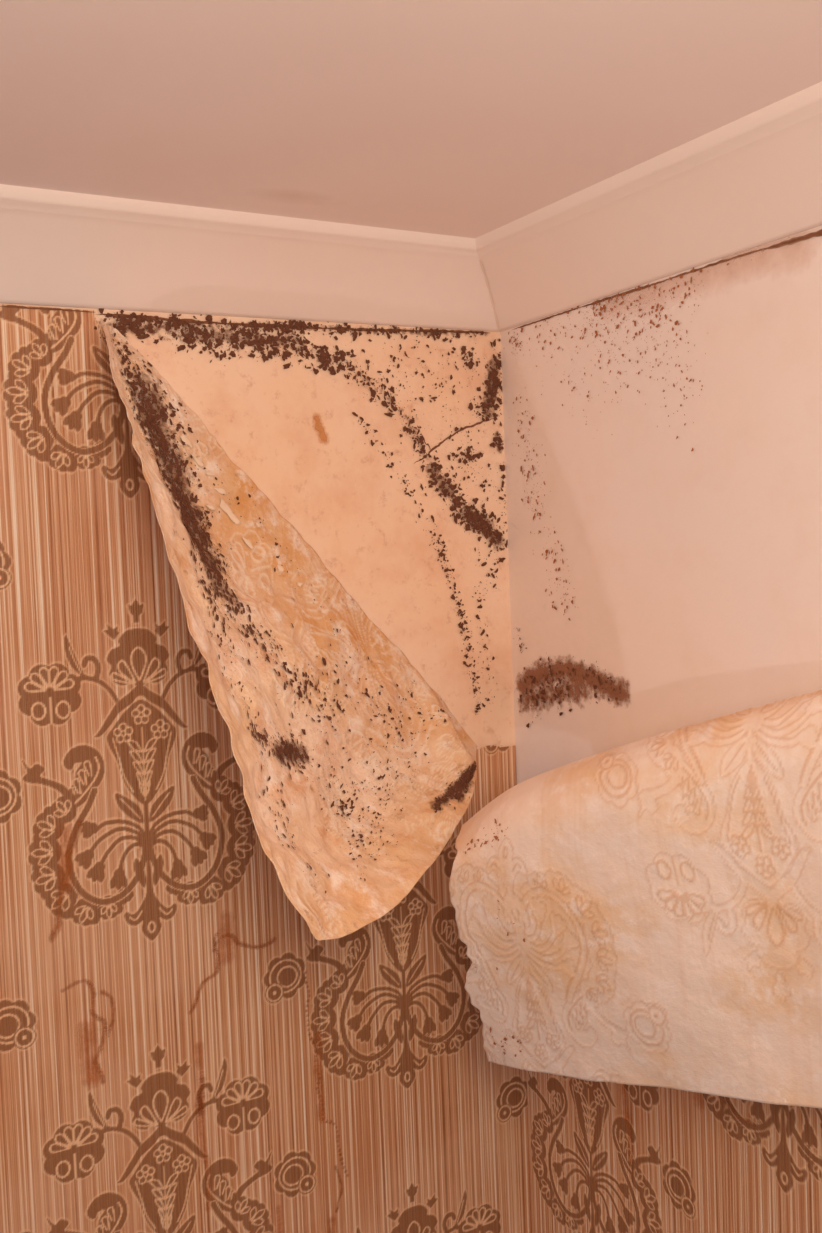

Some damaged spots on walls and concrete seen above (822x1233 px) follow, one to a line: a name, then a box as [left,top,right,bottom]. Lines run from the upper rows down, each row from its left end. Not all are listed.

crack [2,229,822,333]
peeling [180,433,254,549]
damp [94,267,706,881]